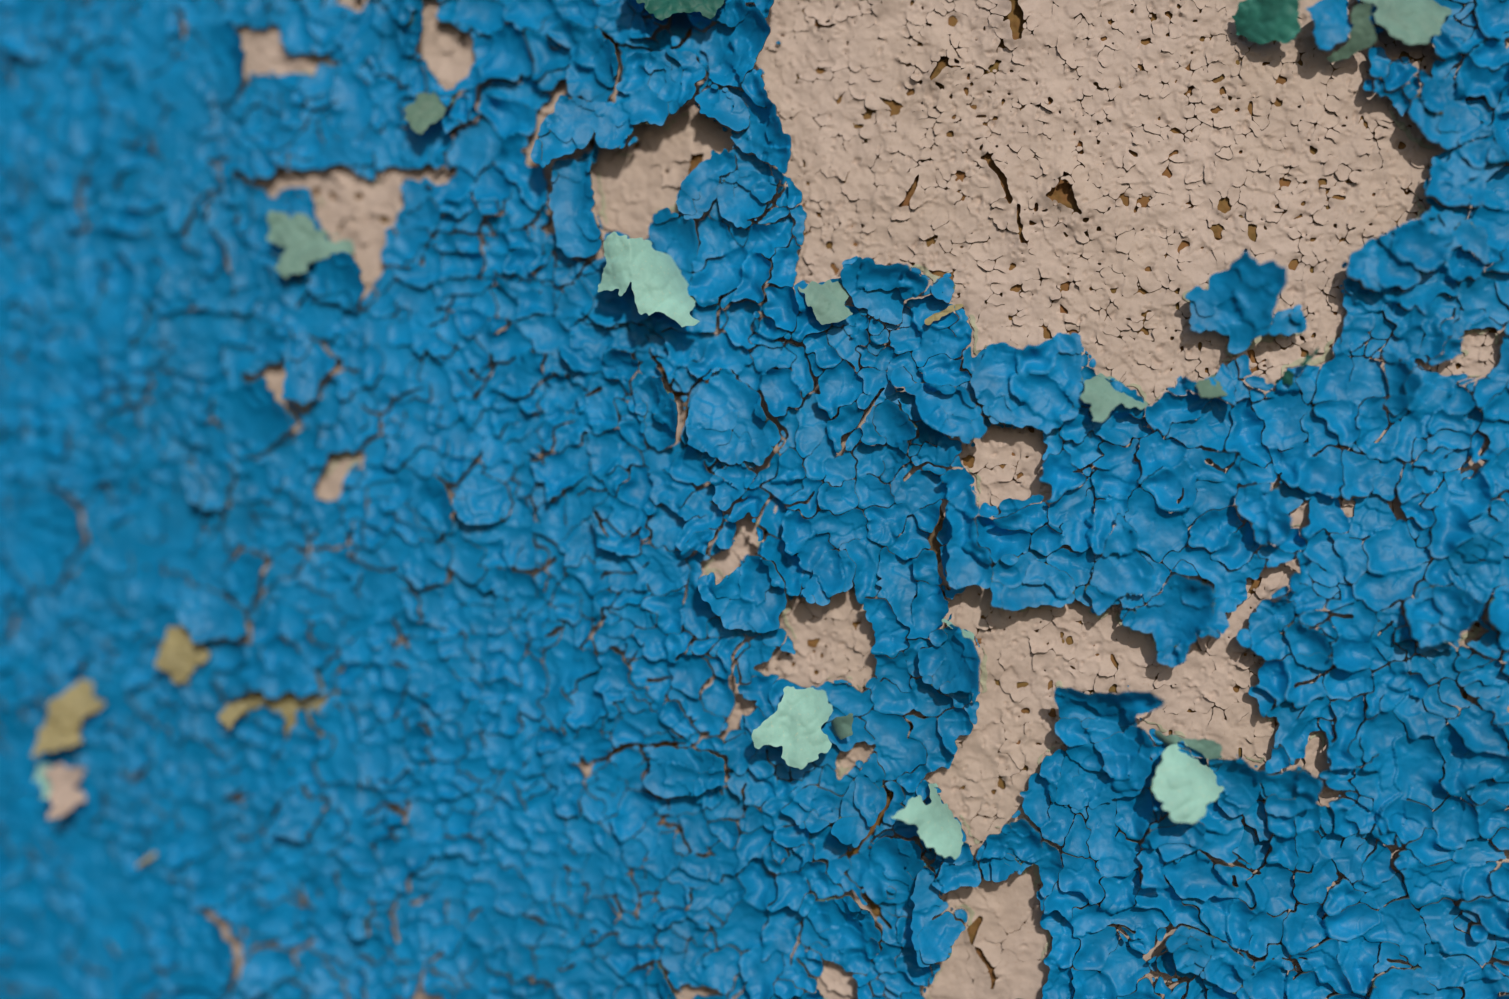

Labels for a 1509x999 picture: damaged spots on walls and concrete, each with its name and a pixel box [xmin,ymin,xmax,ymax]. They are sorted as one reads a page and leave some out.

crack [1003,0,1027,40]
crack [930,56,964,85]
peeling [195,0,508,313]
crack [984,152,1029,245]
peeling [181,325,399,529]
peeling [407,473,513,534]
peeling [511,0,1509,999]
peeling [270,785,329,842]
crack [583,734,716,857]
crack [826,789,894,949]
peeling [347,901,374,940]
crack [967,916,998,989]